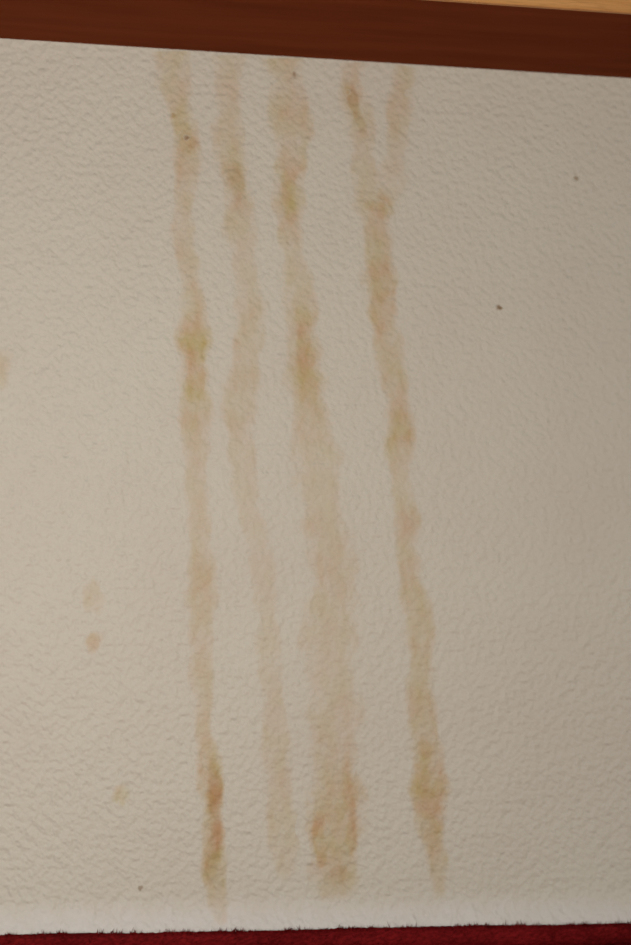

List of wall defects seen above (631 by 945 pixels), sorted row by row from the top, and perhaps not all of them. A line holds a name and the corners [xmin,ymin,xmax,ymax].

water stain [147,51,376,930]
water stain [334,62,456,904]